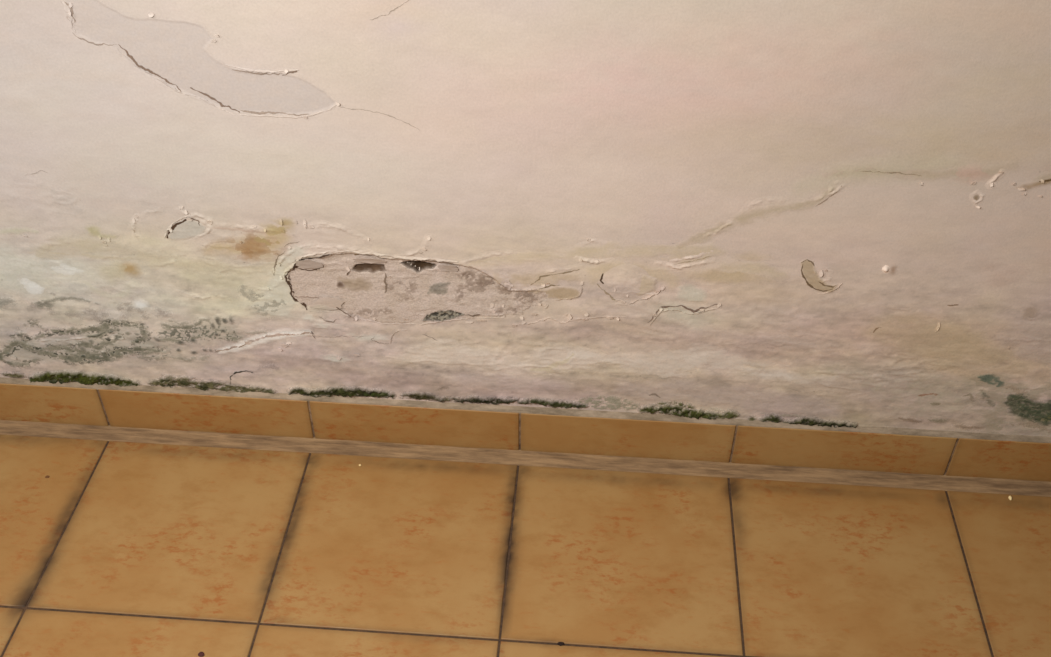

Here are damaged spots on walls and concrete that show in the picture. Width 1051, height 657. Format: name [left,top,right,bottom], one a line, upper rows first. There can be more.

peeling [61,0,340,119]
damp [0,187,275,370]
peeling [164,206,217,242]
flaking render [168,236,588,355]
damp [291,304,1051,437]